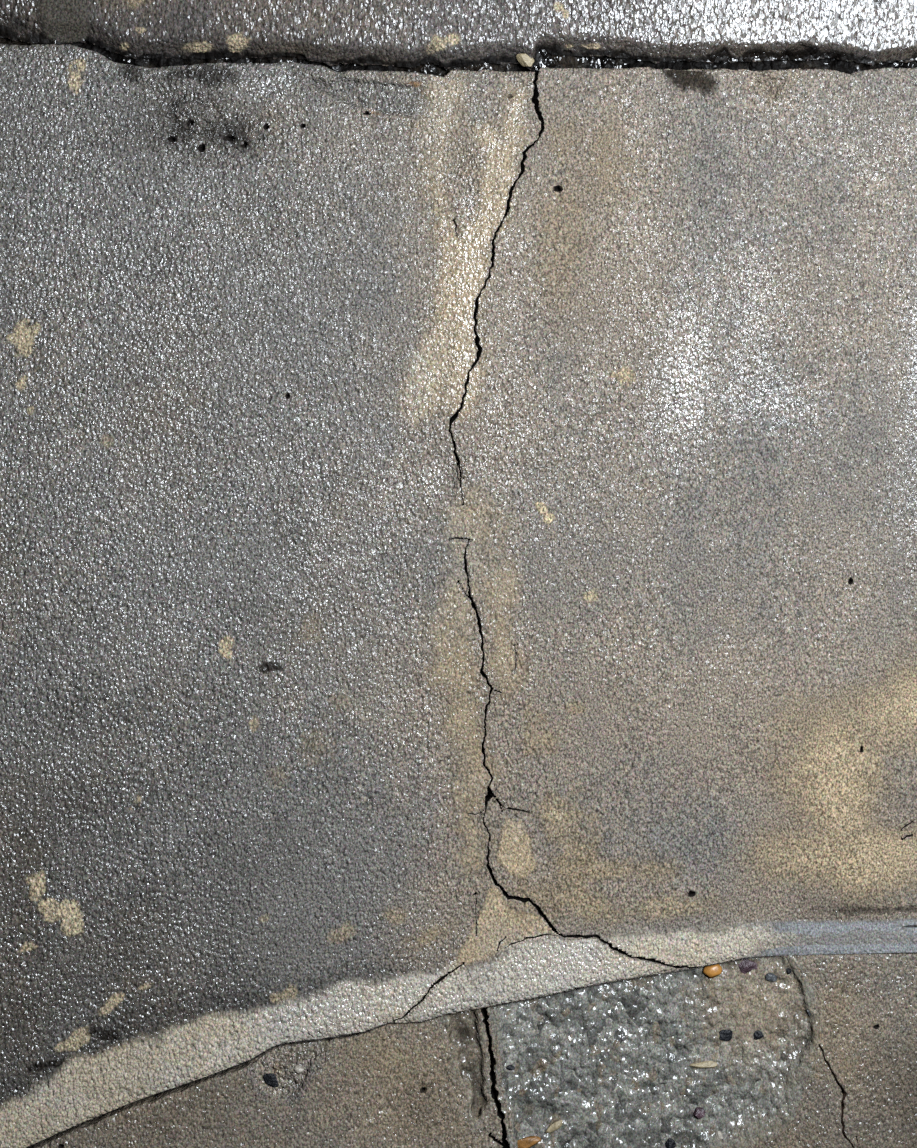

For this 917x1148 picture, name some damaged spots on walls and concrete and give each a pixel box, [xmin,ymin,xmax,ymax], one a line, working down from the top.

crack [442,68,550,505]
crack [449,537,704,973]
crack [395,960,466,1023]
crack [474,1007,517,1148]
spalling [437,955,825,1148]
crack [814,1043,865,1148]